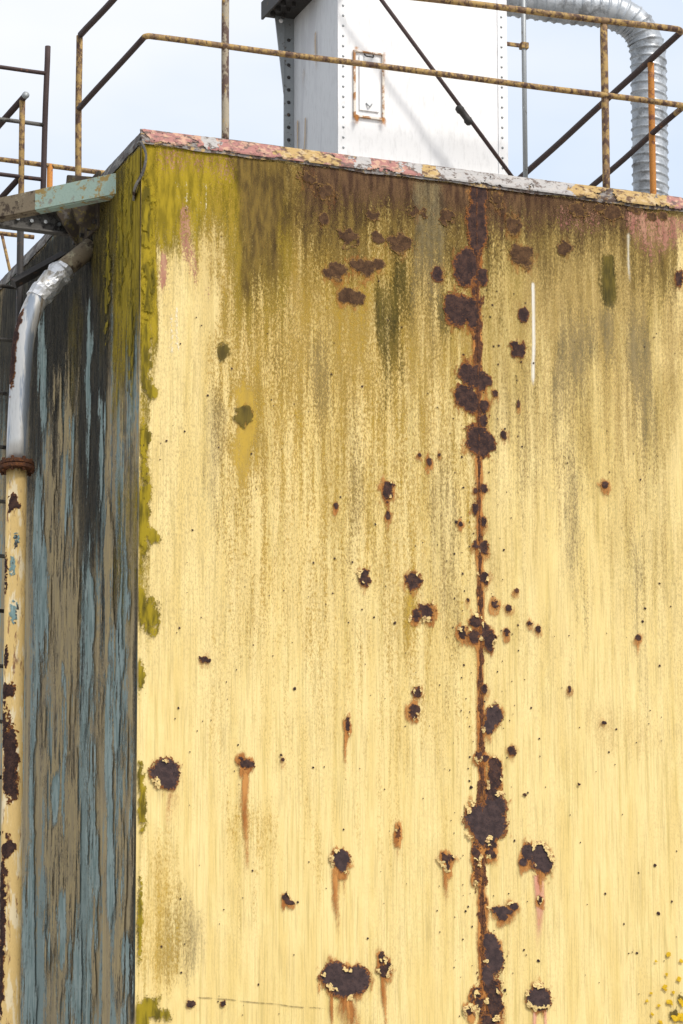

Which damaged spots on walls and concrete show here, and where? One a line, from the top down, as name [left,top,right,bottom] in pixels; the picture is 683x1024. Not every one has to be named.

rust [318,208,418,310]
peeling [142,129,683,262]
leakage [216,156,683,467]
rust [393,570,438,654]
rust [404,186,556,1024]
rust [147,756,183,809]
rust [234,744,256,872]
rust [317,951,393,1024]